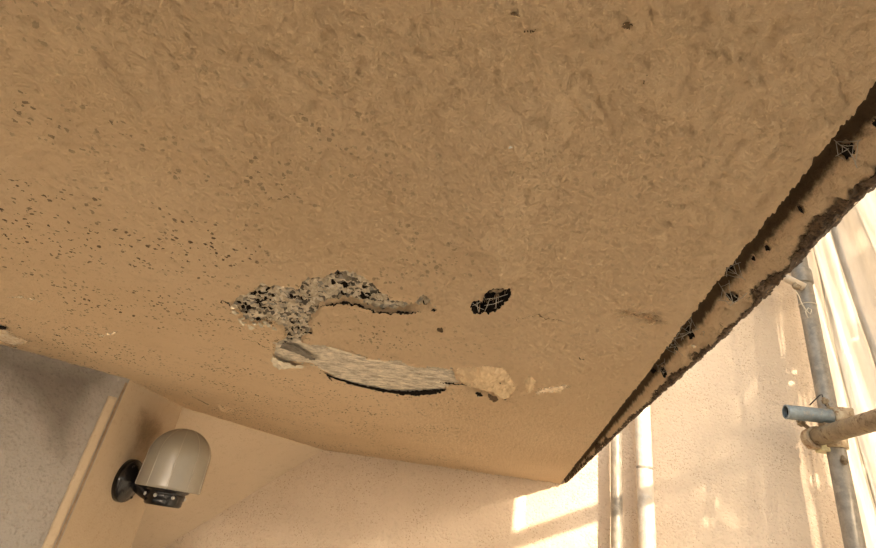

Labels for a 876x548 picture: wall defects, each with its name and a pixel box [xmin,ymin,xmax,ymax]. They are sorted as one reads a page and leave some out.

spalling [834,139,861,168]
spalling [718,262,747,306]
spalling [229,270,536,402]
spalling [650,318,705,389]